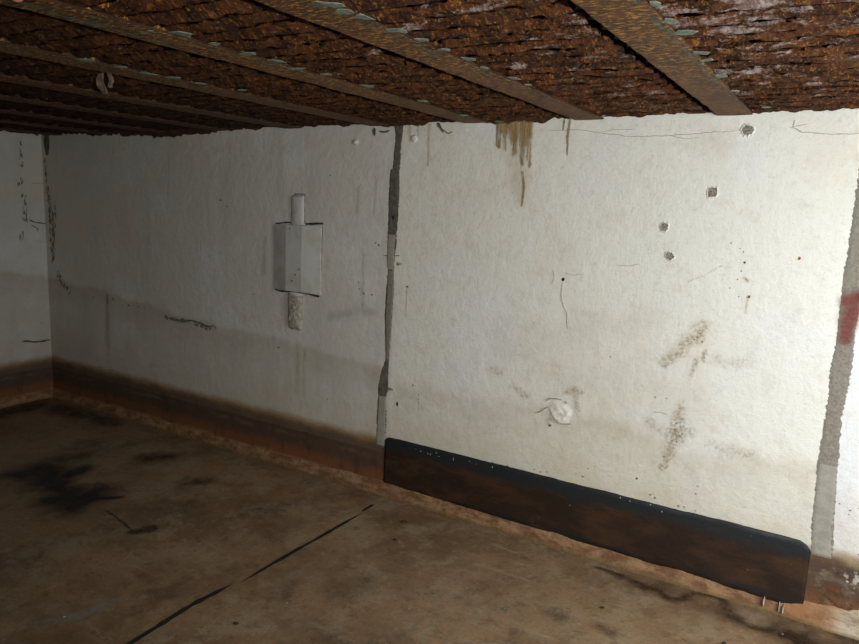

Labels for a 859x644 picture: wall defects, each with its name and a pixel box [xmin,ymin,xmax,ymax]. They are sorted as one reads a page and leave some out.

peeling [2,0,374,91]
corrosion [58,124,272,138]
corrosion [381,116,456,127]
corrosion [480,112,571,206]
corrosion [595,100,713,118]
corrosion [748,103,859,114]
damp [0,357,395,486]
crack [104,509,156,534]
crack [126,504,374,644]
damp [596,567,821,644]
damp [804,549,859,610]